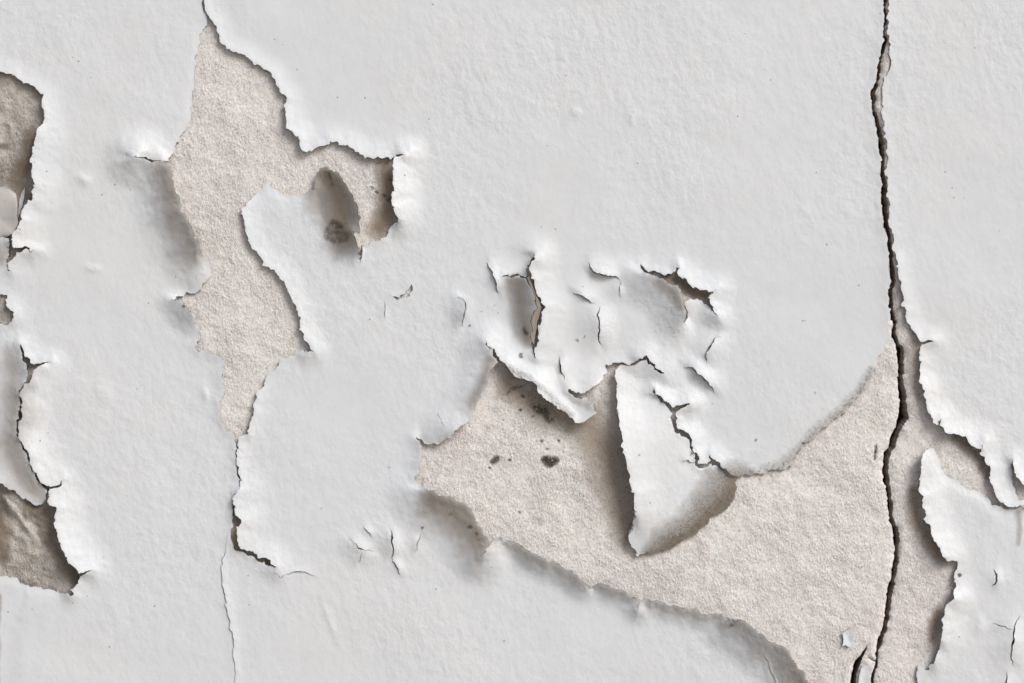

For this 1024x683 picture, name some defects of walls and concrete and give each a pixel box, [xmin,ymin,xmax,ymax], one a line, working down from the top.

peeling [0,55,114,611]
crack [218,532,244,683]
peeling [99,0,431,591]
peeling [383,227,1024,683]
crack [852,0,925,683]